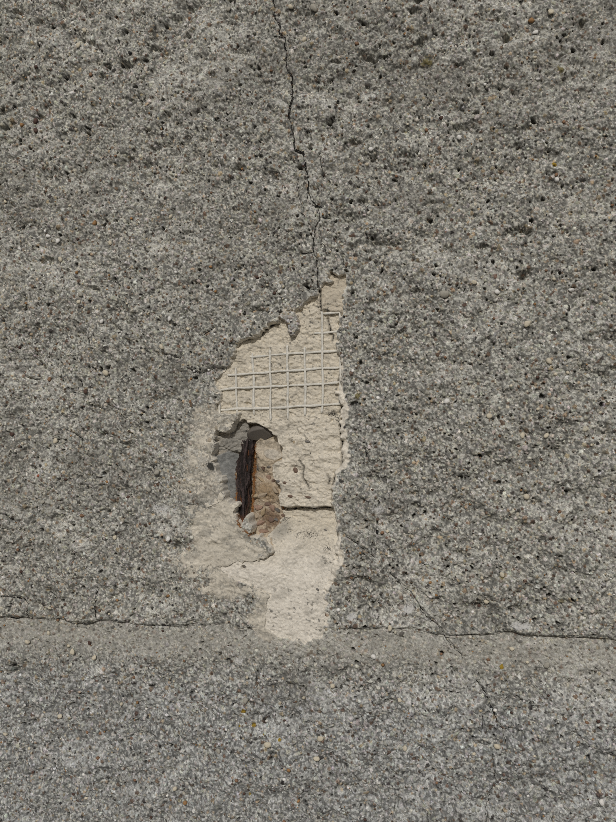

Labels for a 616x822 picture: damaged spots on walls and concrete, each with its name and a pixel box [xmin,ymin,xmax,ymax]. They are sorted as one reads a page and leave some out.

crack [272,0,344,338]
crack [1,595,49,620]
crack [82,589,172,626]
rust [235,438,257,537]
flaking render [167,271,350,644]
crack [346,536,519,822]